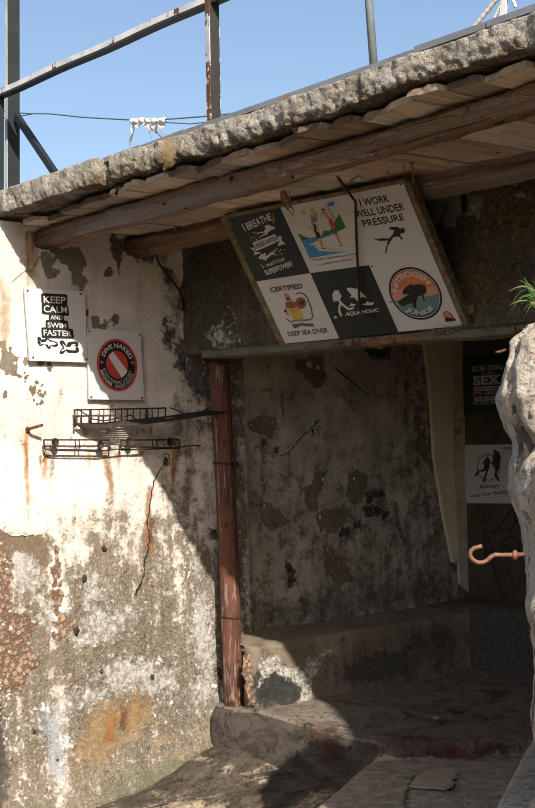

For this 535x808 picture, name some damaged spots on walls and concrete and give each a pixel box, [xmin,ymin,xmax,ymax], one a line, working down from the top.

peeling [40,246,90,291]
peeling [0,340,53,405]
peeling [293,353,327,389]
crack [280,419,321,456]
crack [134,467,163,595]
water stain [253,645,332,707]
crack [402,775,415,808]